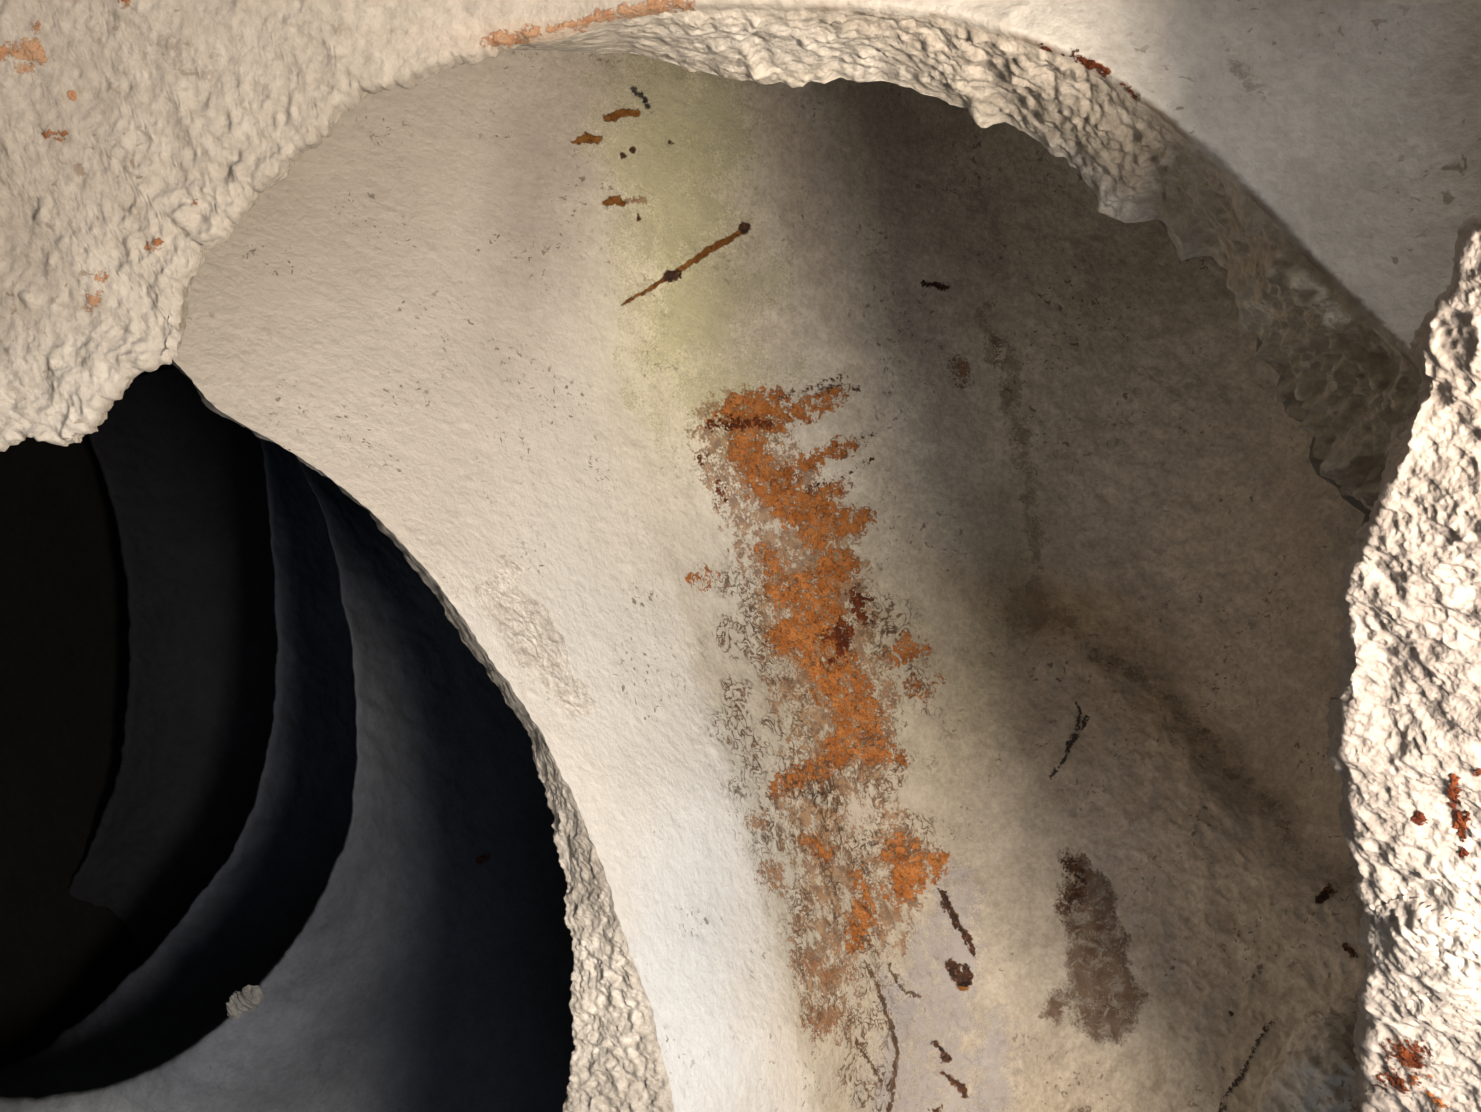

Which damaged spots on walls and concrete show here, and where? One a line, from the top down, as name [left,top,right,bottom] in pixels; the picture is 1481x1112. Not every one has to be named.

corrosion [0,20,48,73]
corrosion [479,0,696,48]
corrosion [571,108,640,145]
corrosion [144,237,164,252]
corrosion [602,195,647,222]
corrosion [621,222,751,306]
spalling [475,559,597,717]
corrosion [679,373,954,1046]
corrosion [1412,811,1428,826]
corrosion [1446,768,1481,858]
damp [1038,848,1149,1046]
corrosion [1371,1036,1449,1112]